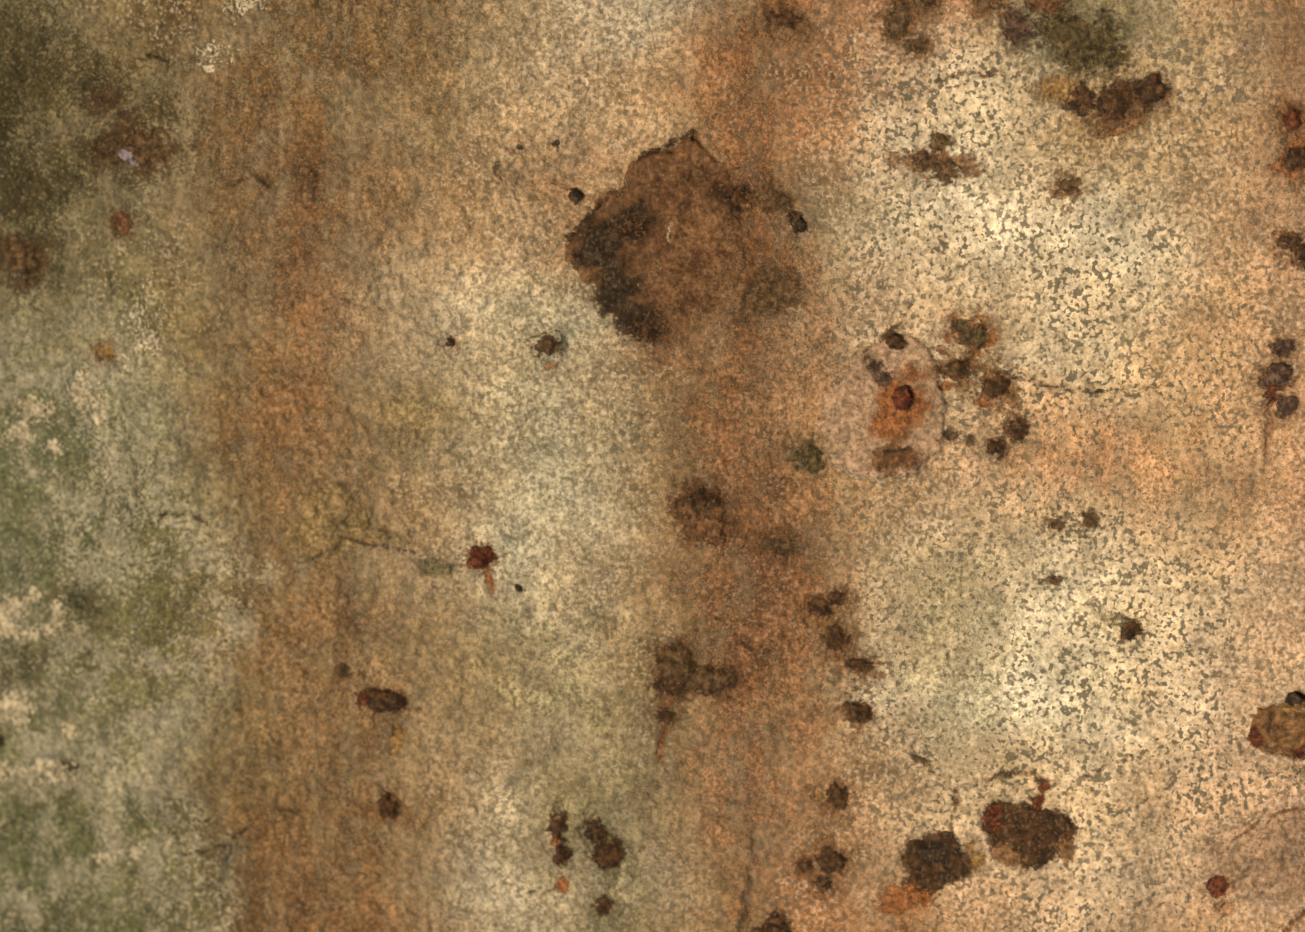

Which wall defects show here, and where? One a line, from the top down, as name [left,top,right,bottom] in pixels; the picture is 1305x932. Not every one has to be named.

spalling [562,129,807,380]
rust [420,538,515,595]
spalling [1248,691,1305,789]
spalling [878,770,1079,915]
spalling [1202,807,1305,901]